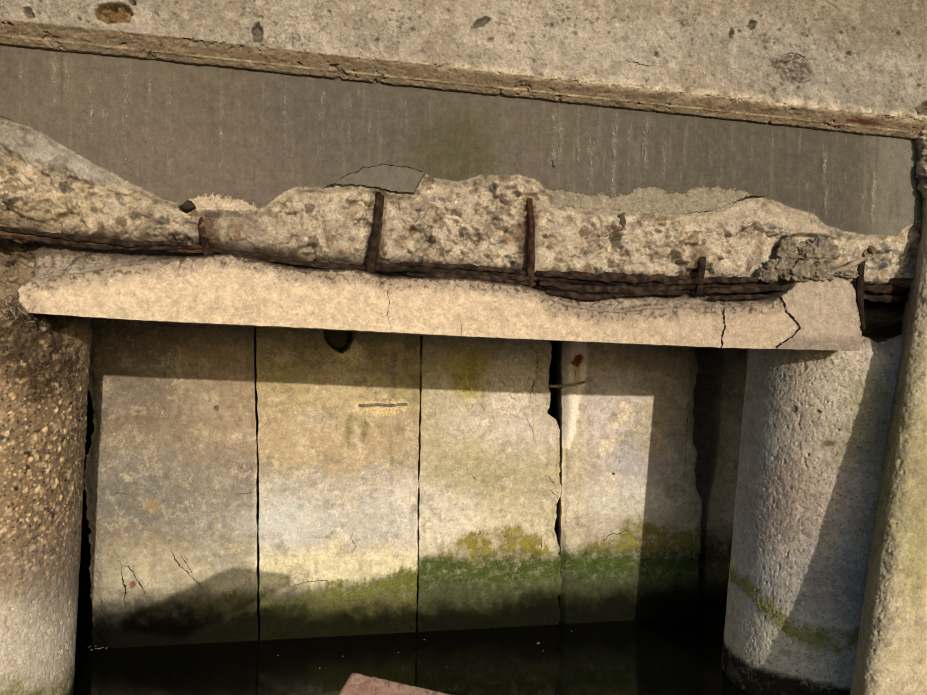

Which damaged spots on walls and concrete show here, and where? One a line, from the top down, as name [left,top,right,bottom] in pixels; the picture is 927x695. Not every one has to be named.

crack [719,308,727,348]
crack [776,296,801,348]
spalling [0,119,922,648]